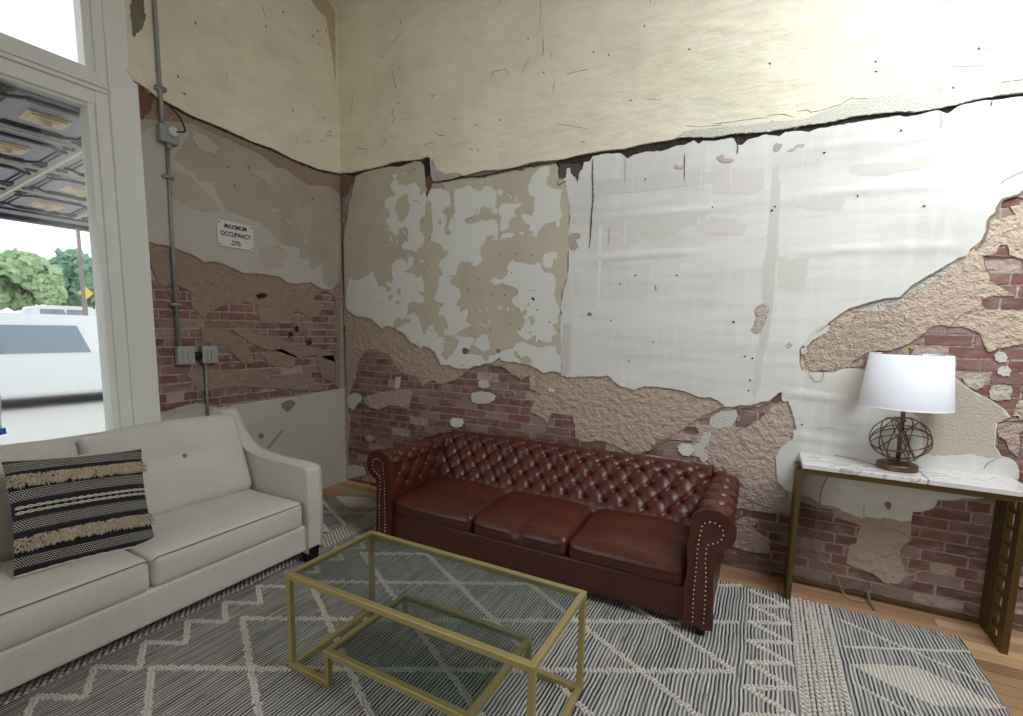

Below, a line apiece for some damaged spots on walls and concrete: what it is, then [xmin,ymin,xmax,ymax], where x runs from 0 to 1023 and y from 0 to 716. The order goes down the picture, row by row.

water stain [130,0,146,37]
crack [491,2,588,90]
crack [133,72,1023,224]
flaking render [138,81,1023,632]